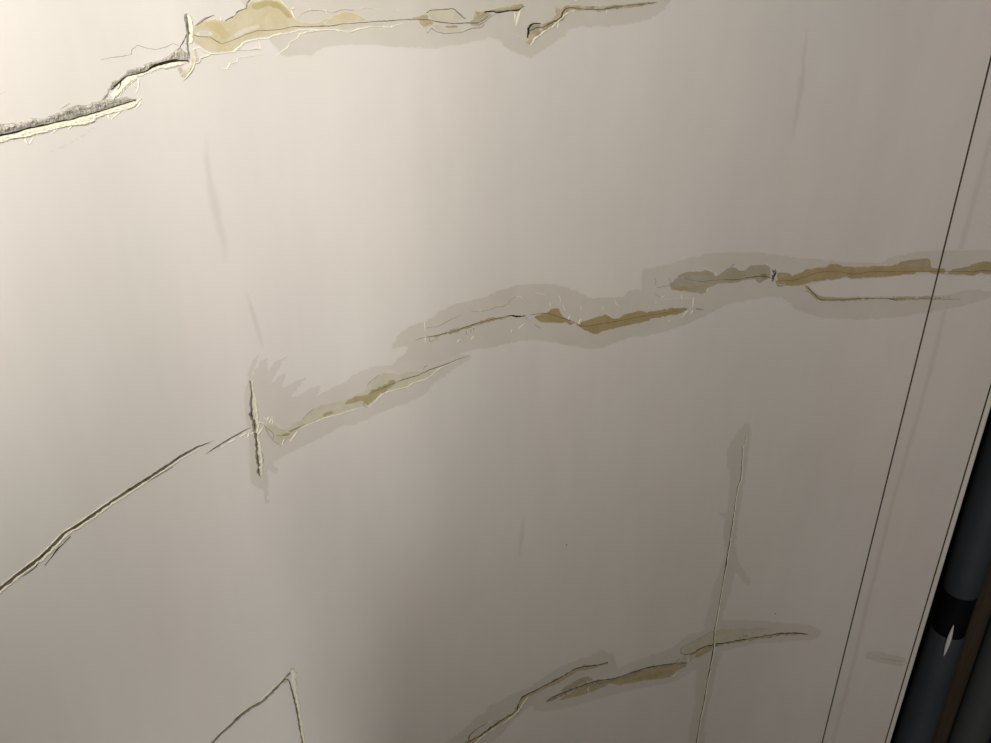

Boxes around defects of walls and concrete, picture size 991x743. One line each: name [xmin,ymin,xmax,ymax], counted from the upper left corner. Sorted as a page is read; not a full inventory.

crack [0,0,657,144]
crack [0,441,213,594]
crack [465,436,808,743]
crack [211,668,305,743]